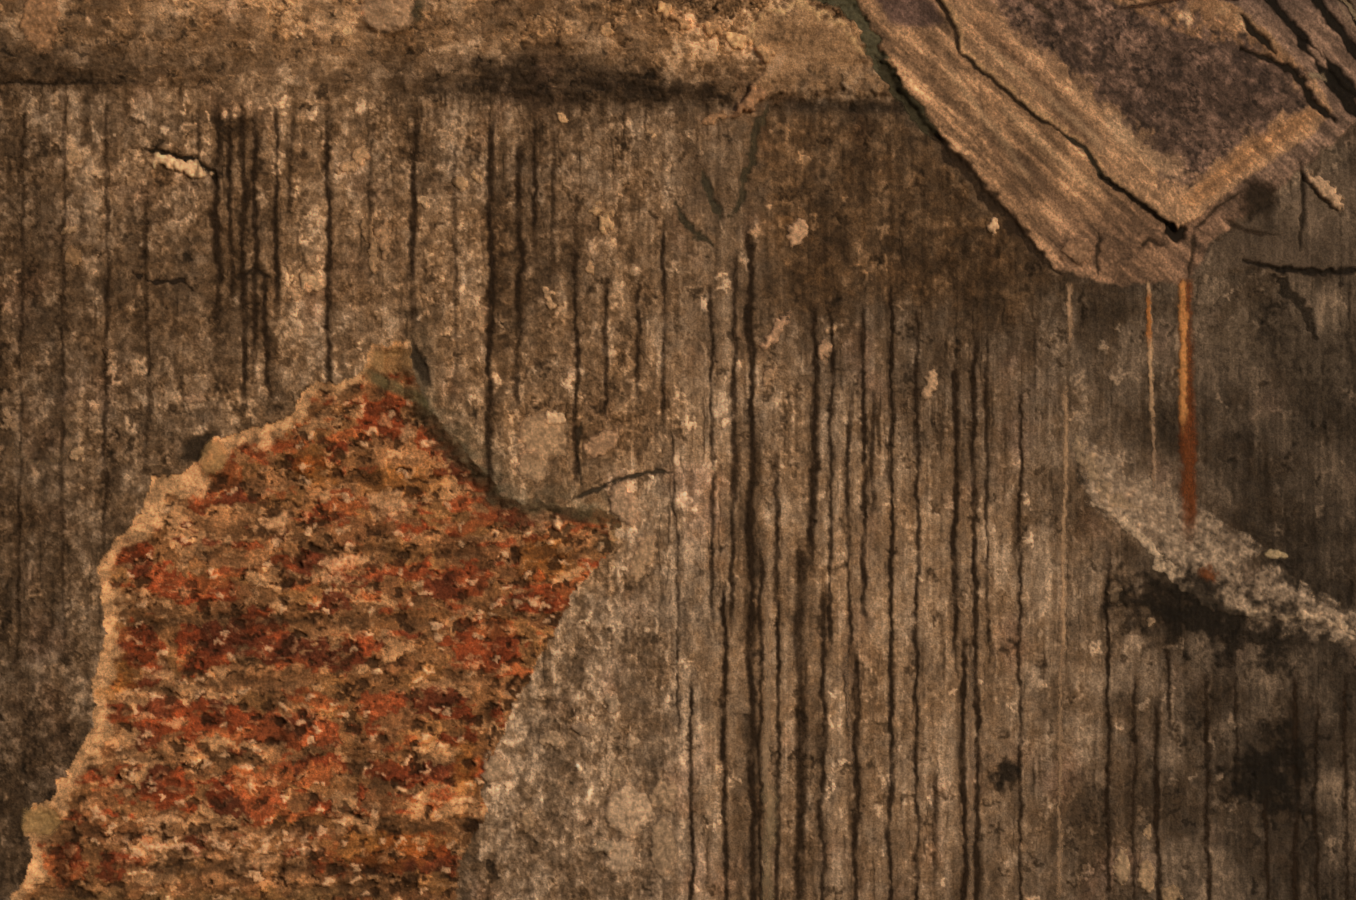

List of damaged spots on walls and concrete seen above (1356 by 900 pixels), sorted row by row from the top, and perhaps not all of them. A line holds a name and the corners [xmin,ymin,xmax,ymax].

peeling [146,148,219,189]
peeling [786,218,808,246]
peeling [857,0,1356,289]
crack [936,0,1356,340]
rust [1146,283,1156,481]
rust [1179,280,1196,520]
spalling [10,340,658,900]